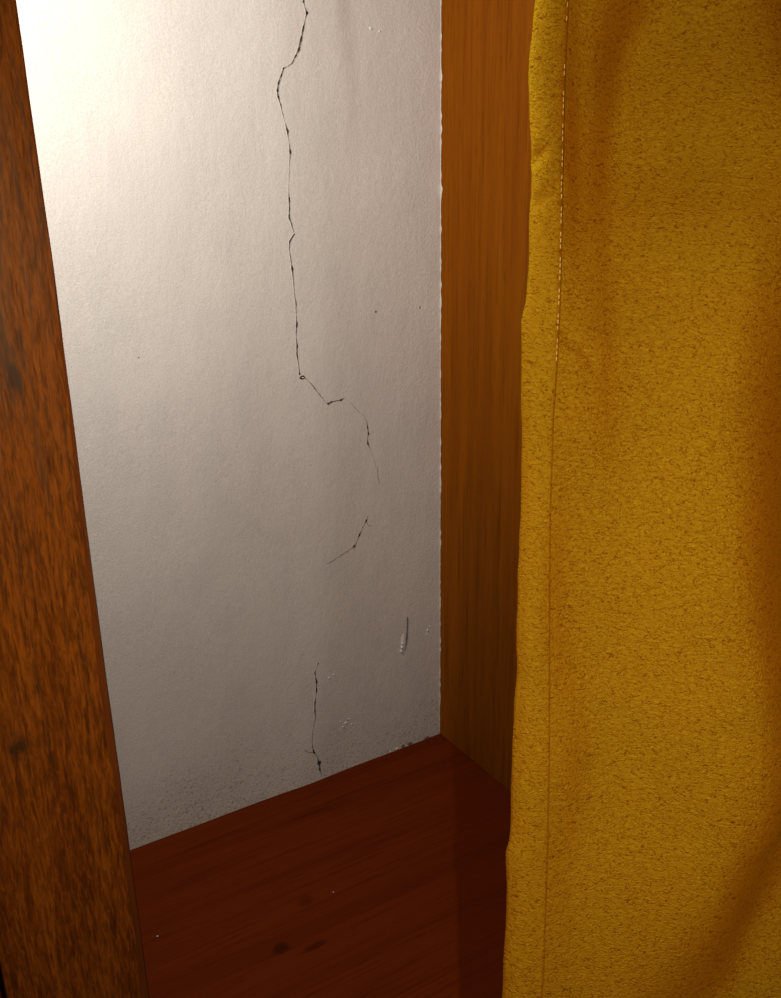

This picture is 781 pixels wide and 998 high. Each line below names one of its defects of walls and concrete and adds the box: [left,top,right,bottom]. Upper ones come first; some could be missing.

crack [275,0,380,484]
crack [303,663,322,775]